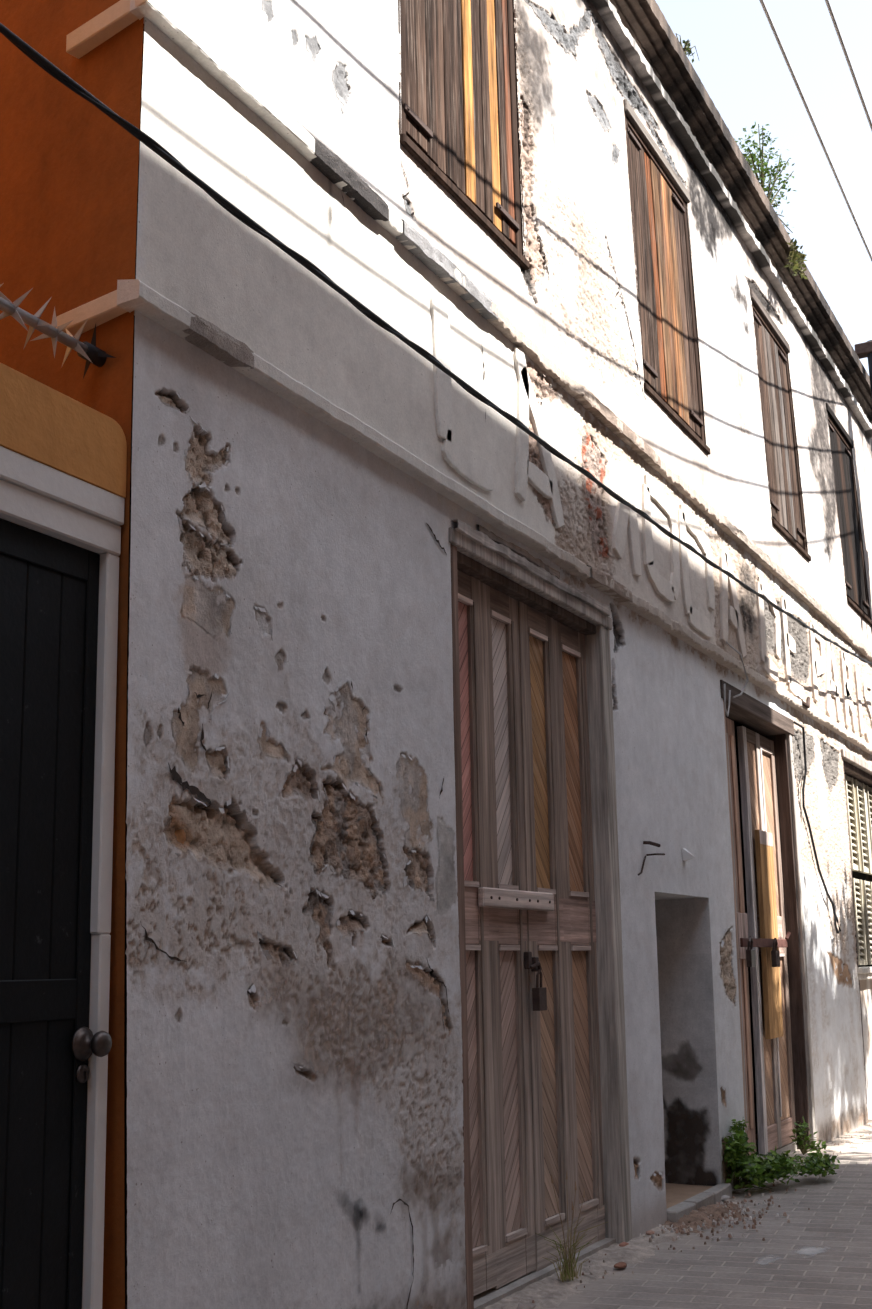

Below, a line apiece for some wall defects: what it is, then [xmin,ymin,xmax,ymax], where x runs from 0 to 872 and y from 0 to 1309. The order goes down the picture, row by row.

flaking render [291,30,322,63]
flaking render [332,62,350,114]
flaking render [525,0,688,189]
flaking render [520,97,546,300]
spalling [526,362,661,471]
flaking render [155,391,238,637]
flaking render [719,515,842,683]
flaking render [163,797,282,888]
flaking render [257,669,386,967]
peeling [396,754,435,942]
flaking render [719,928,736,1003]
peeling [827,952,854,987]